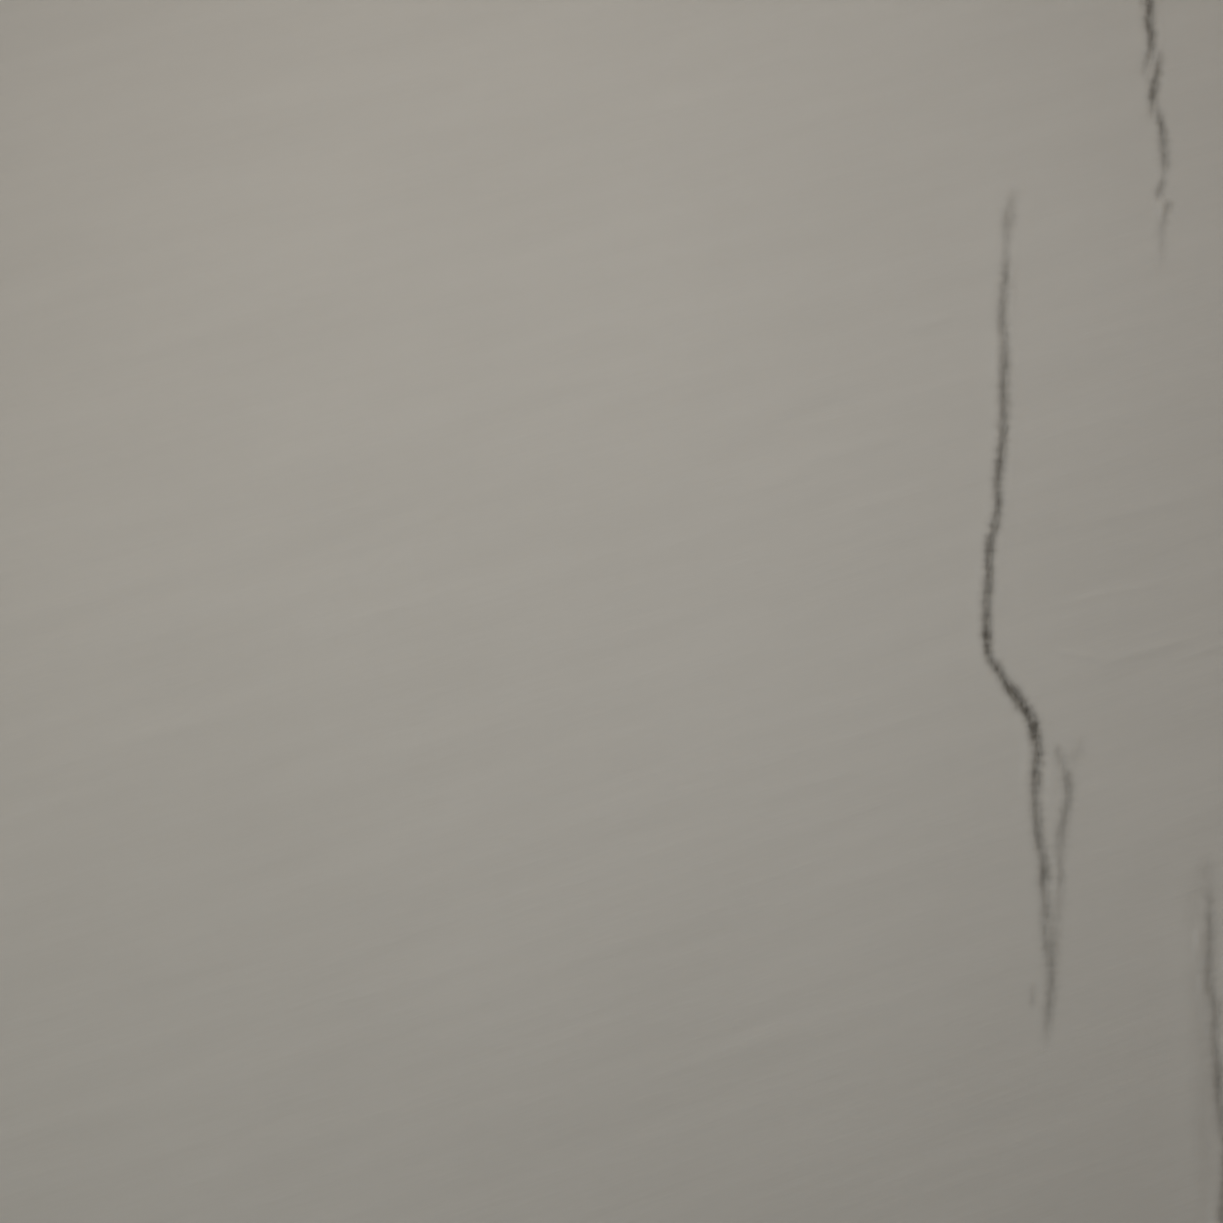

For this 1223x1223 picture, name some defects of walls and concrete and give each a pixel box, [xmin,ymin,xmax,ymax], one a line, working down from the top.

crack [984,631,1037,738]